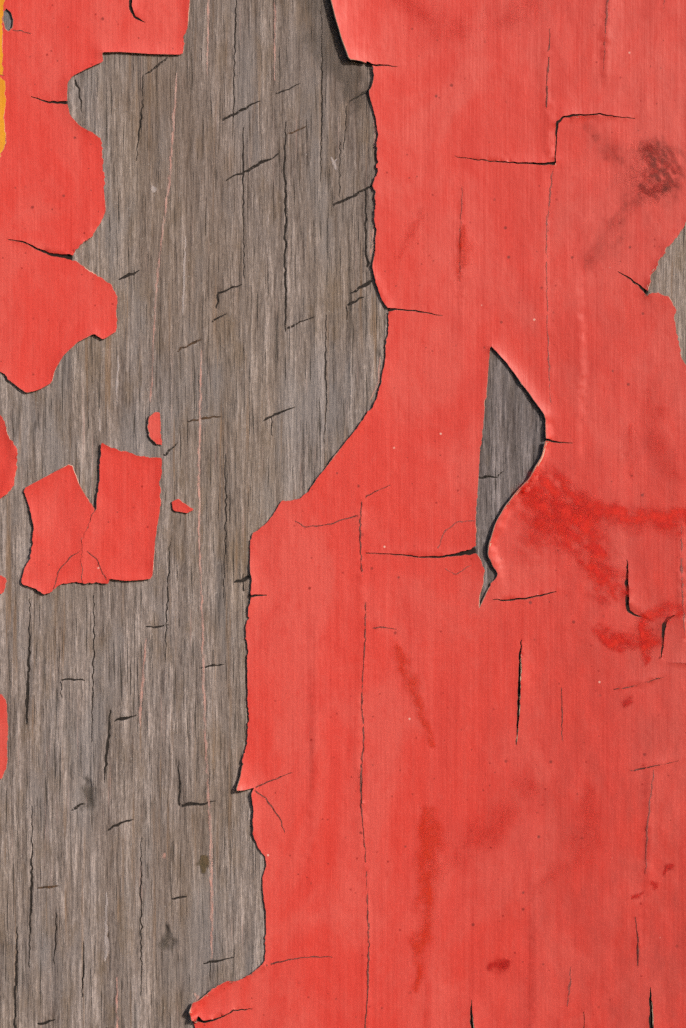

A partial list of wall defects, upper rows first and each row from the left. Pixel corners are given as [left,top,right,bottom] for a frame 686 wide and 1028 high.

crack [129,0,144,22]
peeling [0,0,190,393]
crack [456,29,635,401]
crack [24,598,32,724]
crack [53,551,136,783]
peeling [0,412,193,595]
crack [295,485,476,576]
peeling [188,0,686,1028]
crack [515,640,523,742]
crack [614,526,685,690]
crack [360,603,394,1028]
crack [197,1008,250,1023]